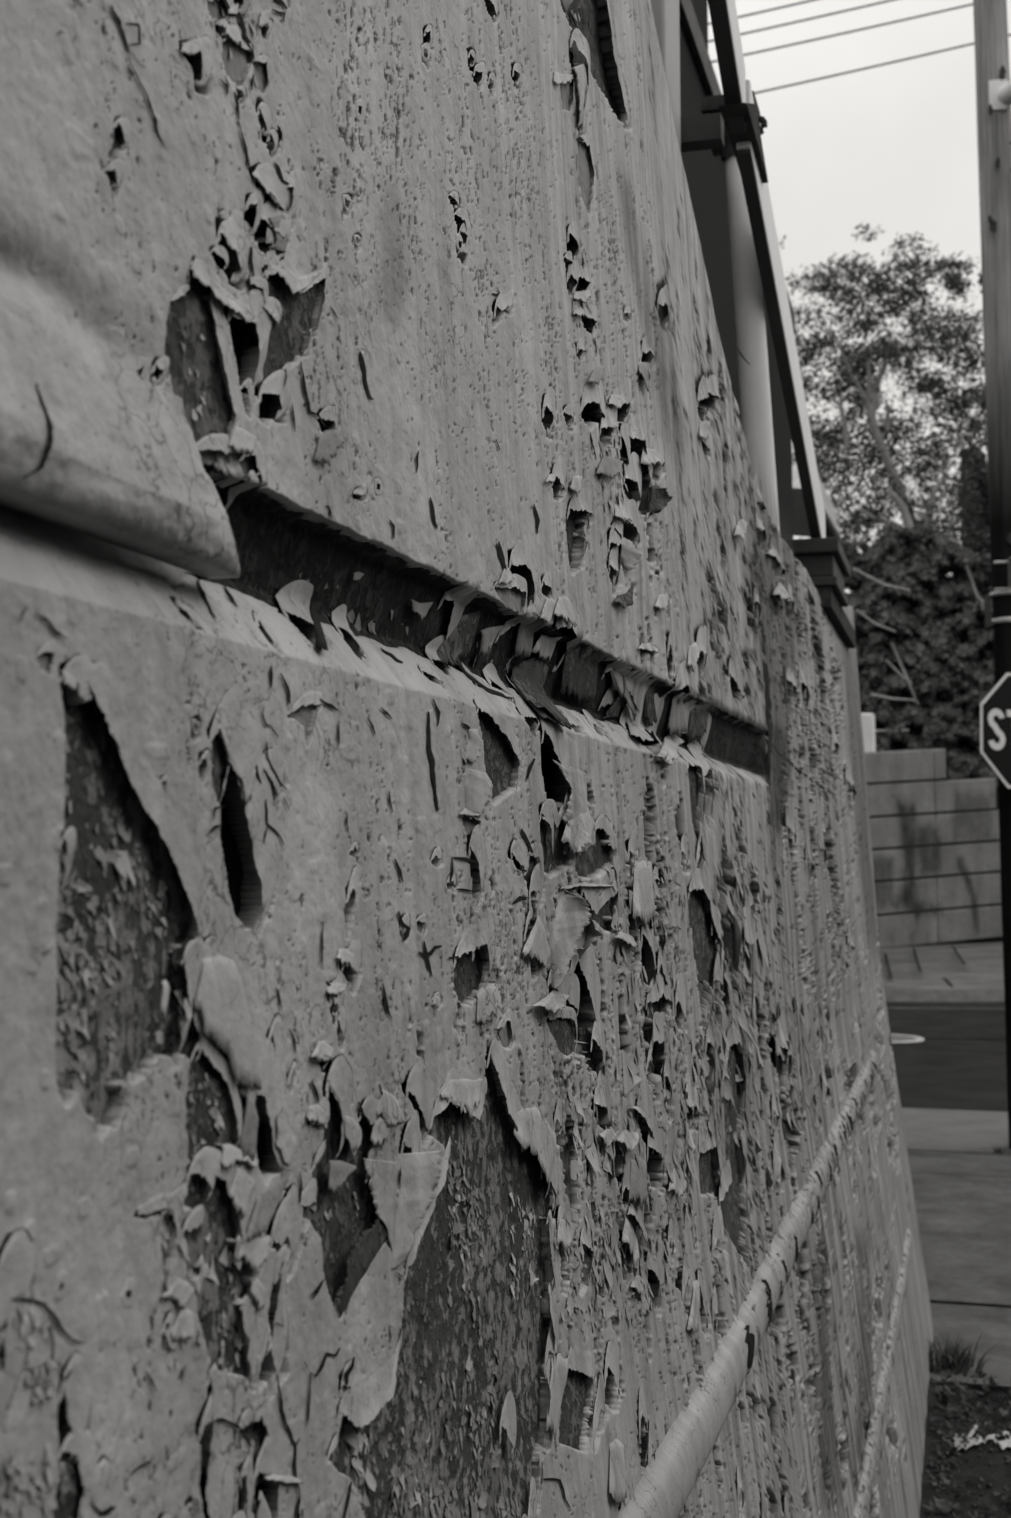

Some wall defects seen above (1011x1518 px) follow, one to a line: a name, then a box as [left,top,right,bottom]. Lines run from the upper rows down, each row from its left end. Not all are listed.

peeling [468,49,522,91]
peeling [104,117,130,188]
peeling [137,0,344,510]
peeling [448,191,471,264]
peeling [542,0,672,609]
peeling [695,374,720,454]
peeling [156,560,217,626]
peeling [493,535,577,627]
peeling [734,474,794,627]
peeling [53,573,866,1518]
crack [134,1193,174,1218]
crack [0,1228,153,1518]